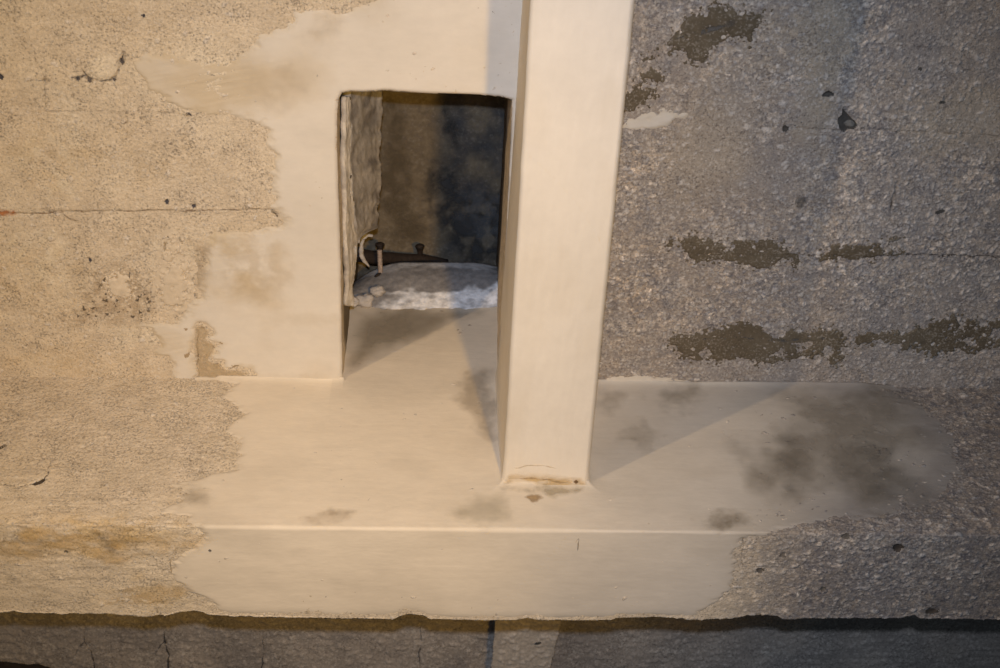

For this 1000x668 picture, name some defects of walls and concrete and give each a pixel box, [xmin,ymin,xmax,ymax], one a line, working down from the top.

spalling [624,0,773,112]
spalling [659,229,803,272]
spalling [817,235,906,268]
peeling [184,327,241,377]
spalling [663,313,1000,369]
damp [777,395,904,497]